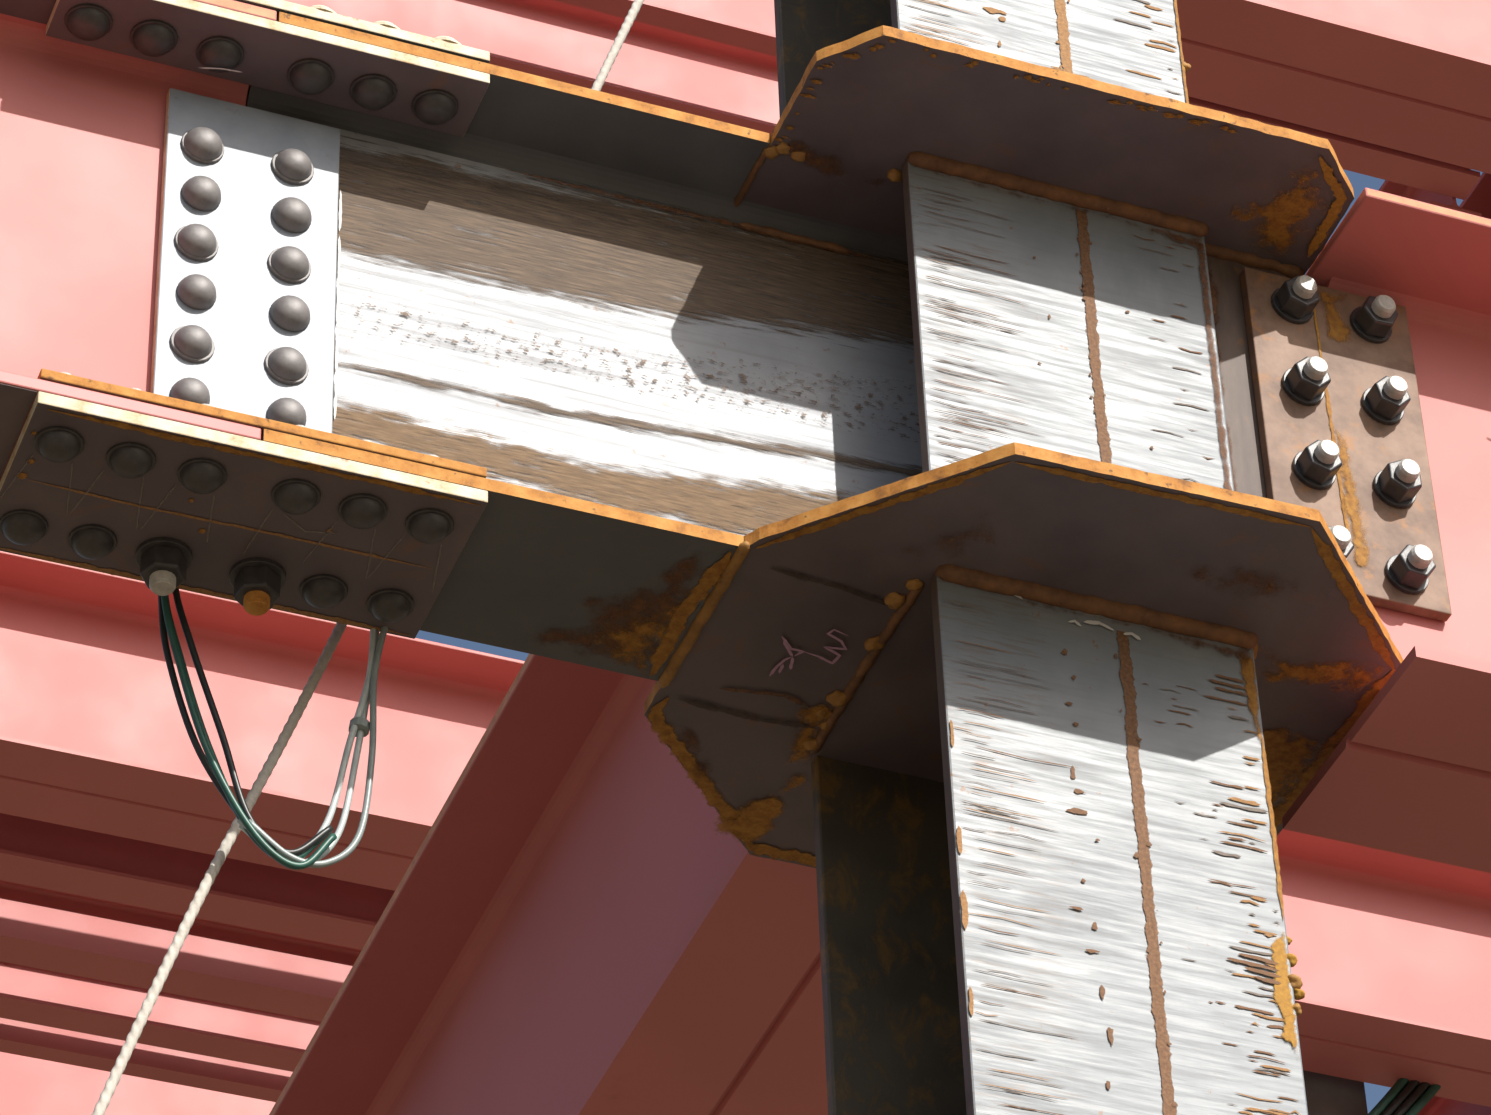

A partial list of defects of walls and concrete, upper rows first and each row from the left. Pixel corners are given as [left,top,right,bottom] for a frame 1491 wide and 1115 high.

corrosion [774,0,1007,175]
corrosion [332,136,1396,1115]